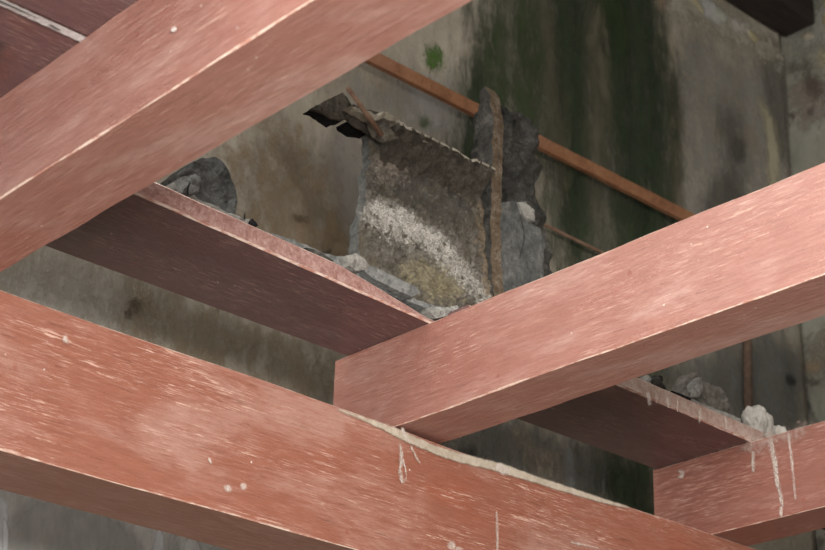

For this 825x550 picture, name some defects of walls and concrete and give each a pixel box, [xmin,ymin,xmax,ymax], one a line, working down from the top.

damp [708,110,755,209]
damp [760,58,787,185]
peeling [516,202,535,223]
damp [671,333,803,470]
damp [445,419,612,498]
damp [769,438,783,516]